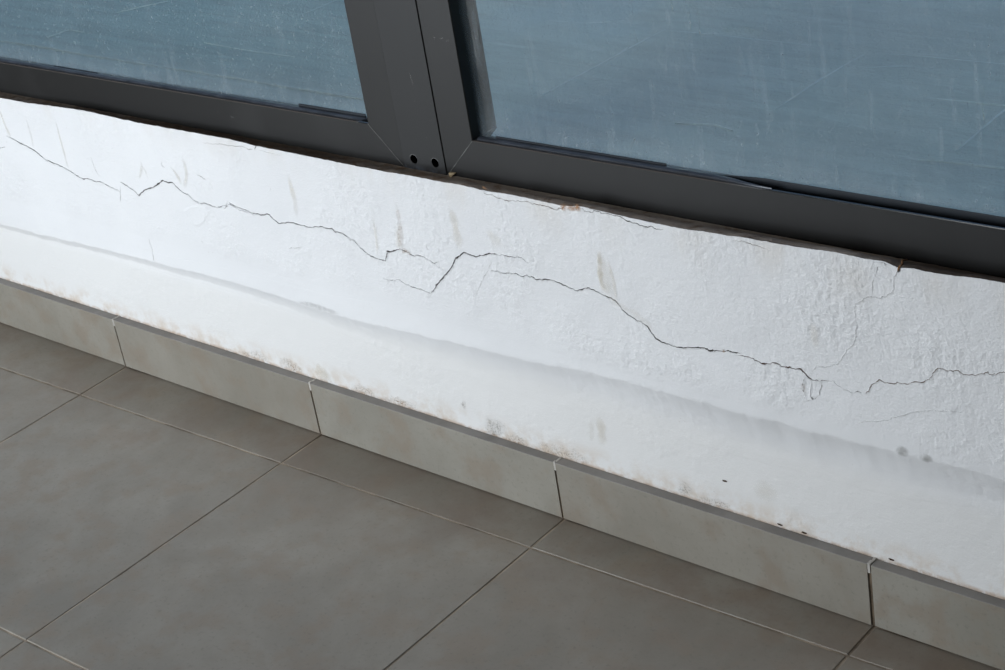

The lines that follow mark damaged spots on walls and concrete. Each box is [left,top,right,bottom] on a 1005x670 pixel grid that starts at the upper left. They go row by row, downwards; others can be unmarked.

crack [0,136,1005,394]